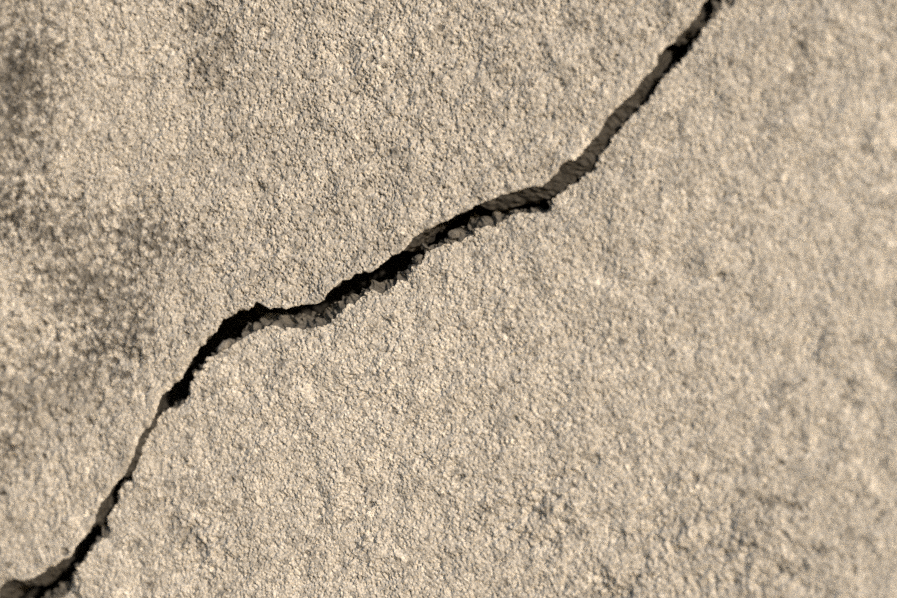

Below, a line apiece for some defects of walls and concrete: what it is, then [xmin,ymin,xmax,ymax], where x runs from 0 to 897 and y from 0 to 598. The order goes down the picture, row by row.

crack [403,0,722,253]
crack [0,249,425,598]